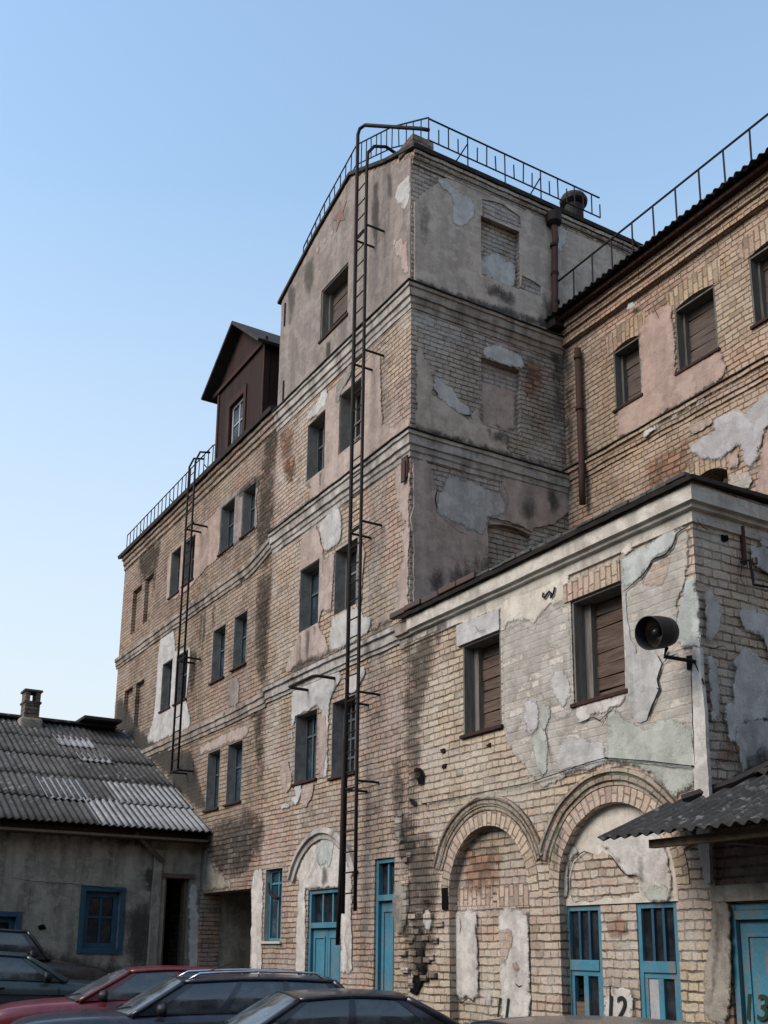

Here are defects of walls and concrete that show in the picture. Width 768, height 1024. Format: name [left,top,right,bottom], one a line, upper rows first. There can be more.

peeling [285,336,542,498]
peeling [688,392,768,495]
peeling [147,630,190,744]
peeling [463,523,768,796]
crack [509,646,727,784]
leakage [208,810,264,875]
leakage [391,624,677,972]
spalling [564,846,669,903]
peeling [392,880,448,994]
spalling [498,929,518,976]